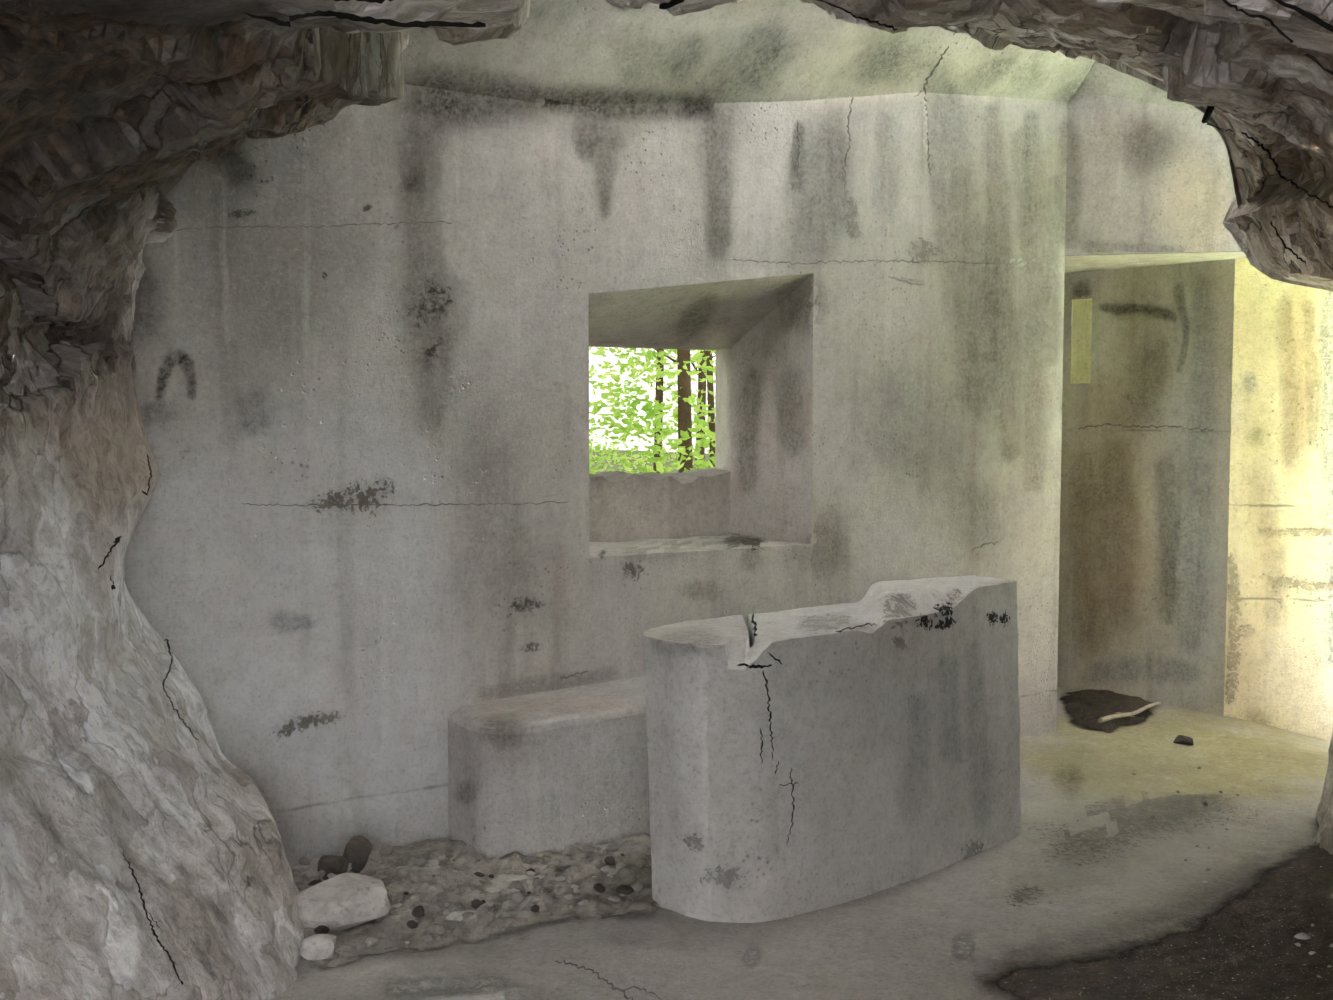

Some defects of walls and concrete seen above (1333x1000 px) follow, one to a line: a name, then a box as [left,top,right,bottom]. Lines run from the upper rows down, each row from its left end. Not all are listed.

damp [411,280,457,362]
spalling [880,593,916,650]
crack [737,614,798,844]
crack [556,960,662,1000]